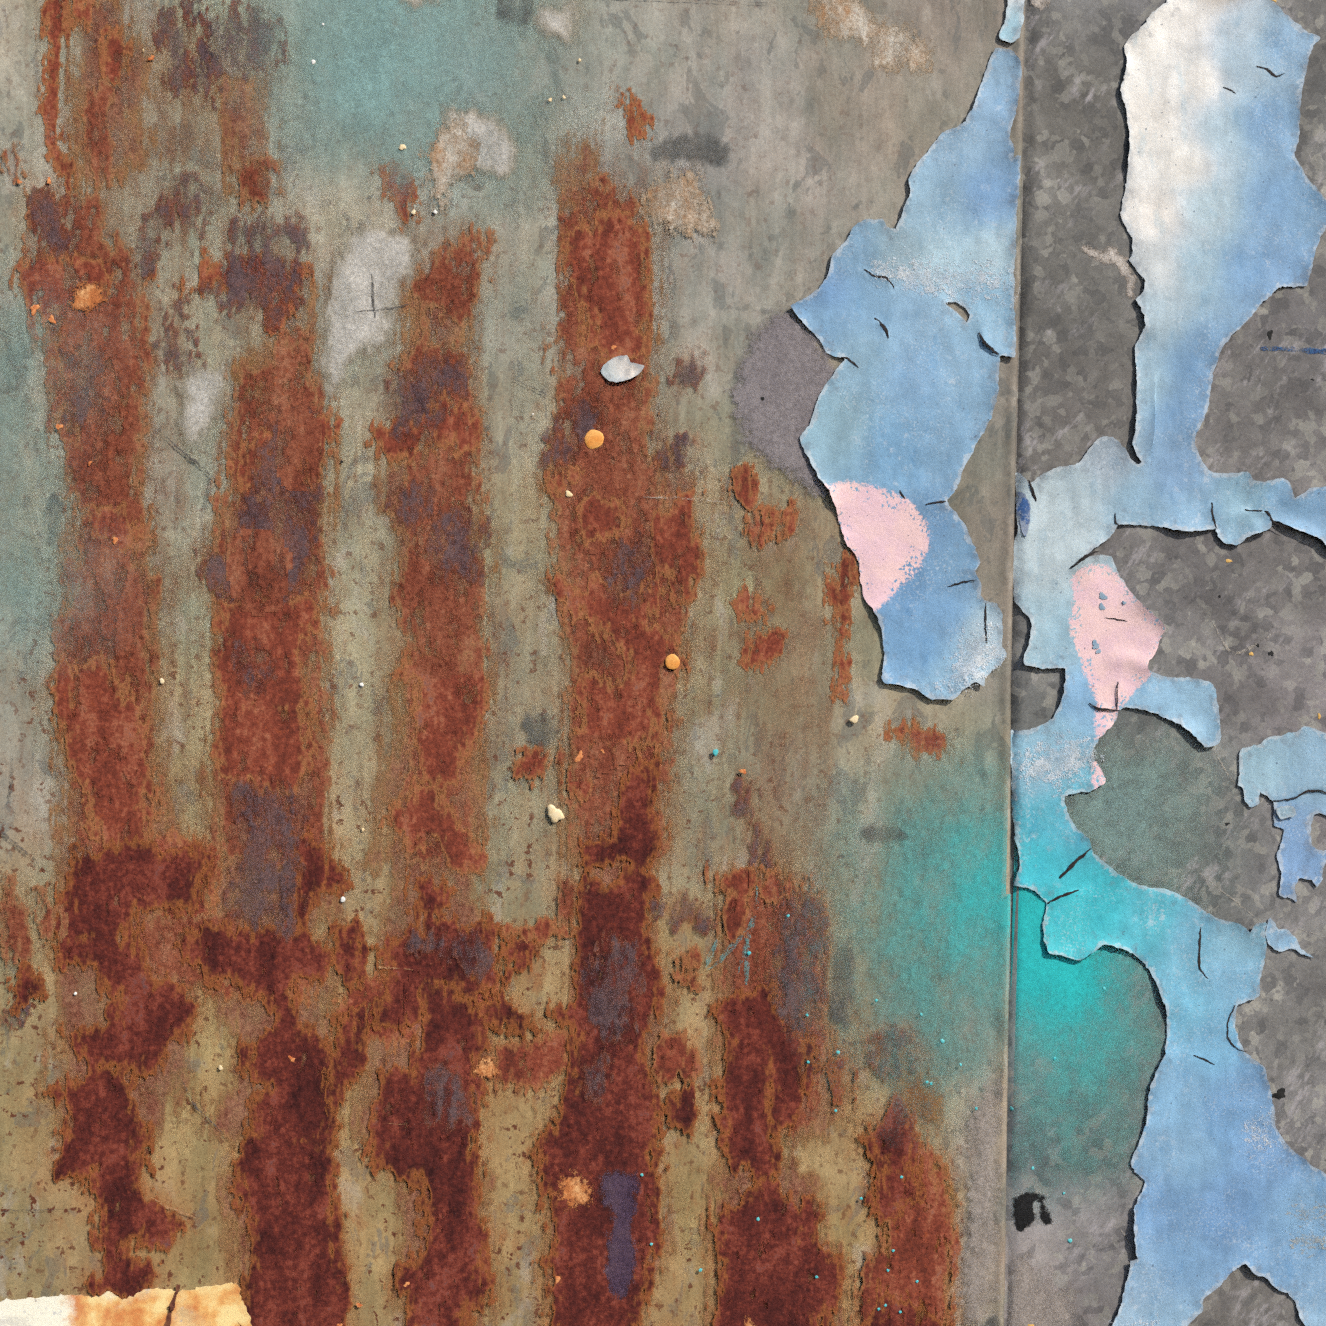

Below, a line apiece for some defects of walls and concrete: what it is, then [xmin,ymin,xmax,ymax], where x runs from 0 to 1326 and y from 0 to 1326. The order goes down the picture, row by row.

crack [164,1284,180,1326]
rust [0,0,963,1326]
peeling [790,0,1025,700]
peeling [1011,0,1326,1326]